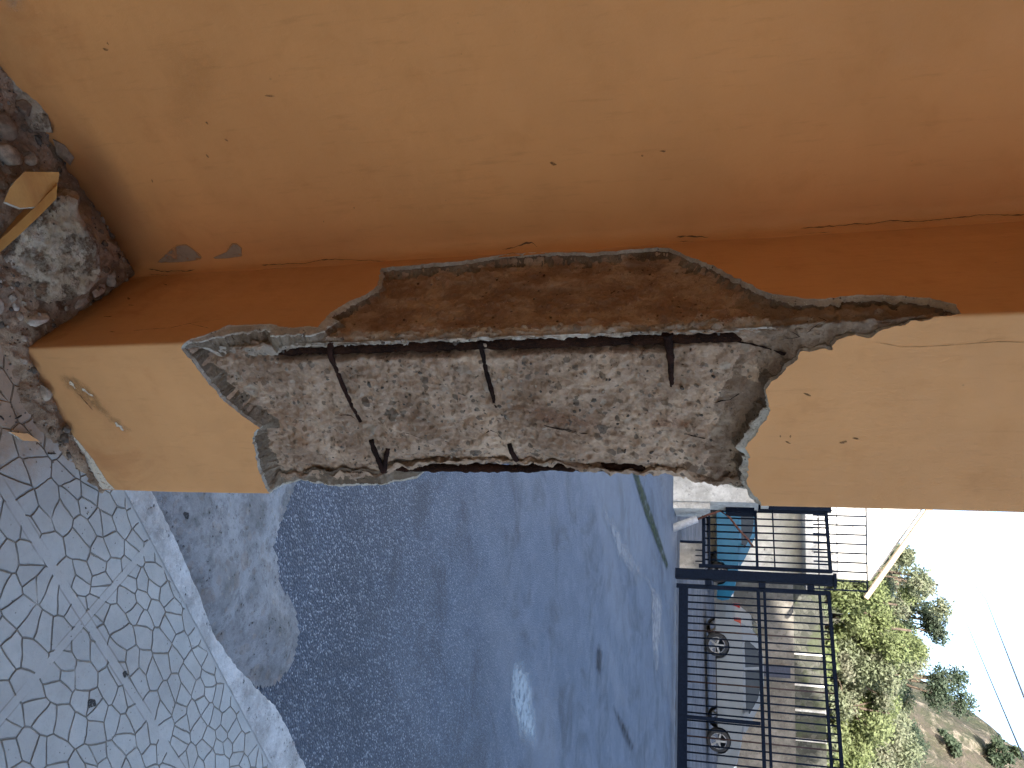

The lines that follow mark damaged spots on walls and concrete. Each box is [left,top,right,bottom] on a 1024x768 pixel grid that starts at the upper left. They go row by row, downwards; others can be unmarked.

crack [801,214,1024,233]
peeling [159,243,242,263]
spalling [181,247,961,506]
spalling [72,435,114,490]